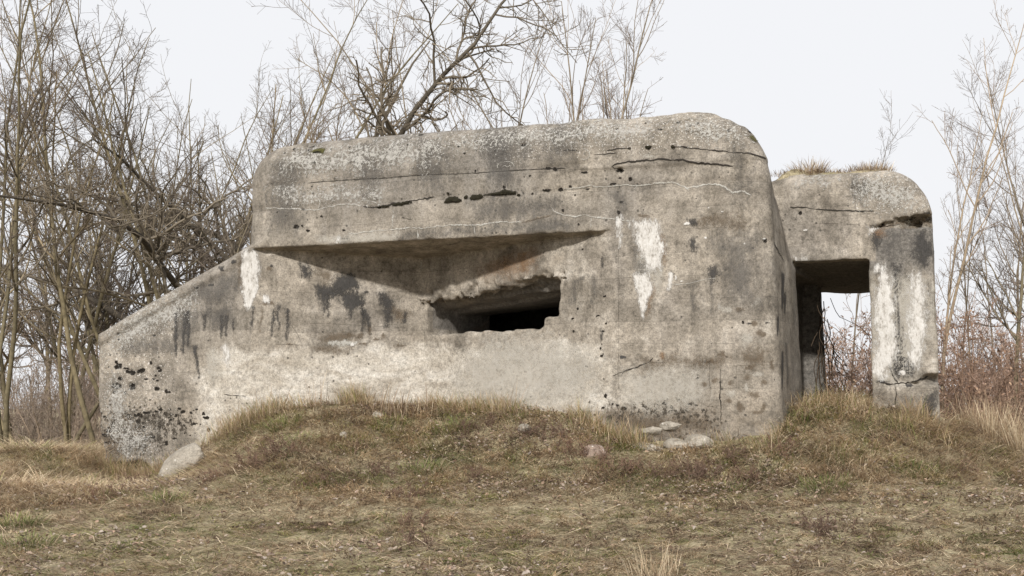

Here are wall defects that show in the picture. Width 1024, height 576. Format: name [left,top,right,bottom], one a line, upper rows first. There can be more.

crack [267,146,766,238]
crack [775,201,873,212]
spalling [868,210,932,235]
leakage [218,248,290,338]
leakage [299,263,406,333]
leakage [616,201,664,317]
leakage [173,309,206,378]
leakage [220,314,234,363]
crack [877,367,929,404]